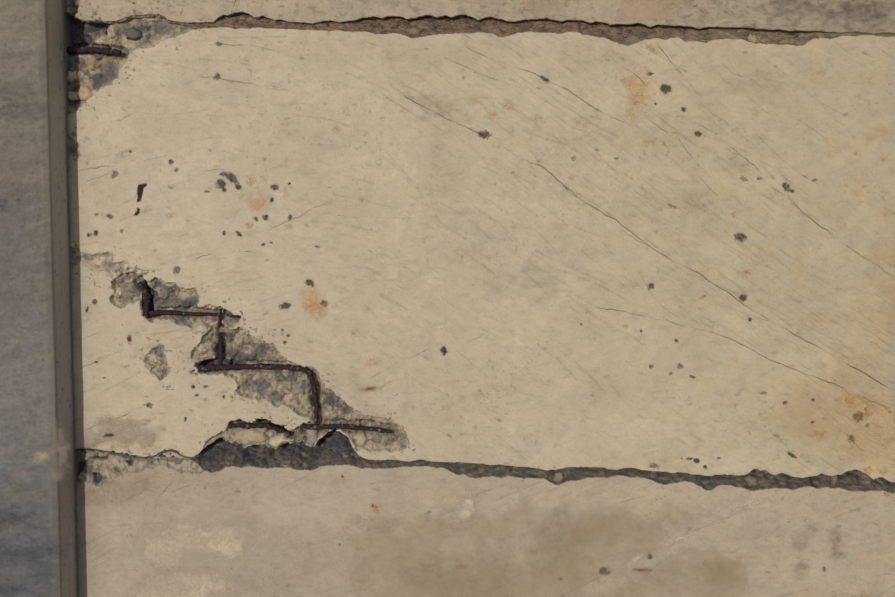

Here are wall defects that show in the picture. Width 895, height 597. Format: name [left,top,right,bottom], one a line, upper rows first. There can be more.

spalling [66,0,203,115]
spalling [68,128,90,167]
spalling [70,230,417,459]
spalling [76,441,223,496]